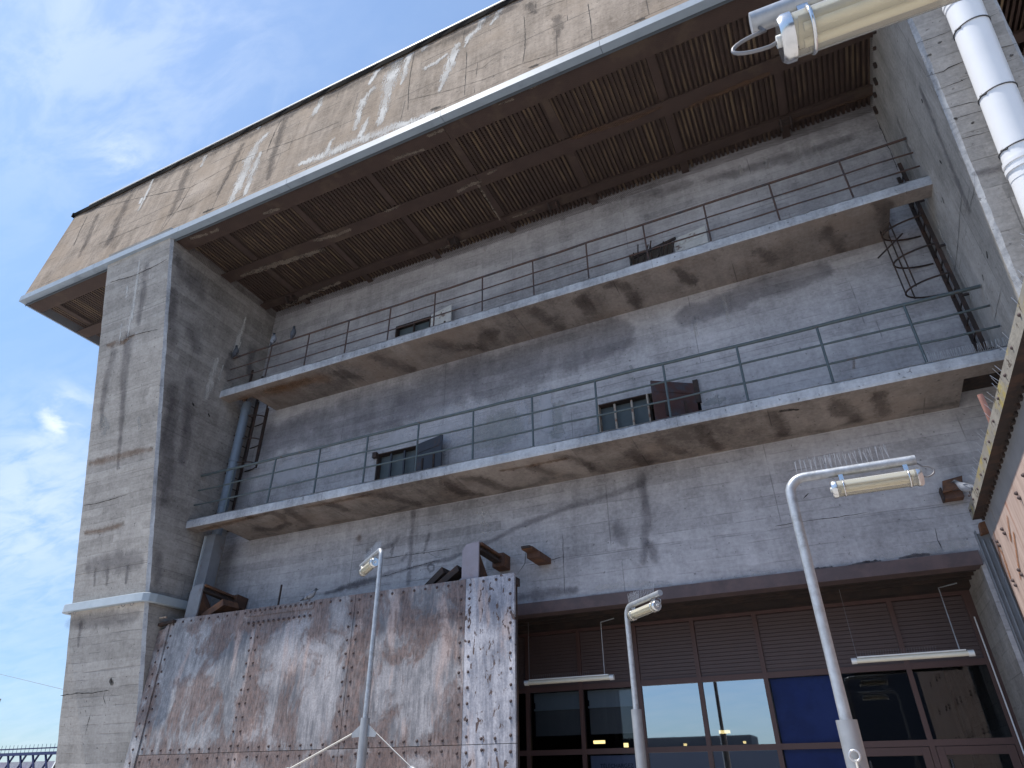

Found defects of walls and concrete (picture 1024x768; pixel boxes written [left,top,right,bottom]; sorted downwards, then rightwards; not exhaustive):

damp [228,126,268,204]
damp [298,45,434,166]